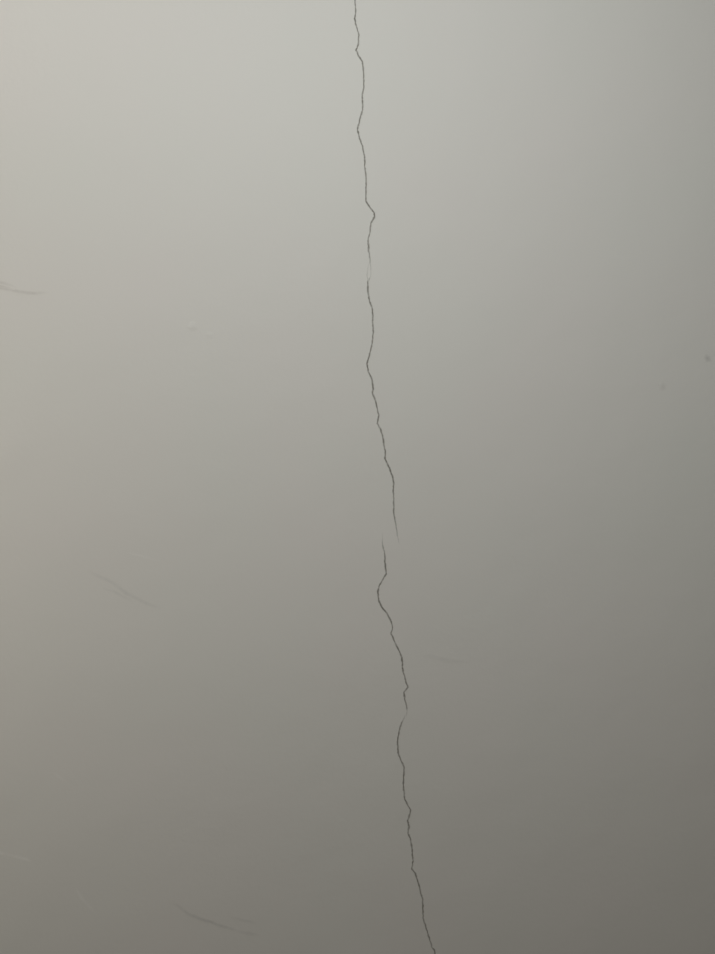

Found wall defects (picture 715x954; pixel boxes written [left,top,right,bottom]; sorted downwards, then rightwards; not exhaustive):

crack [352,0,437,954]